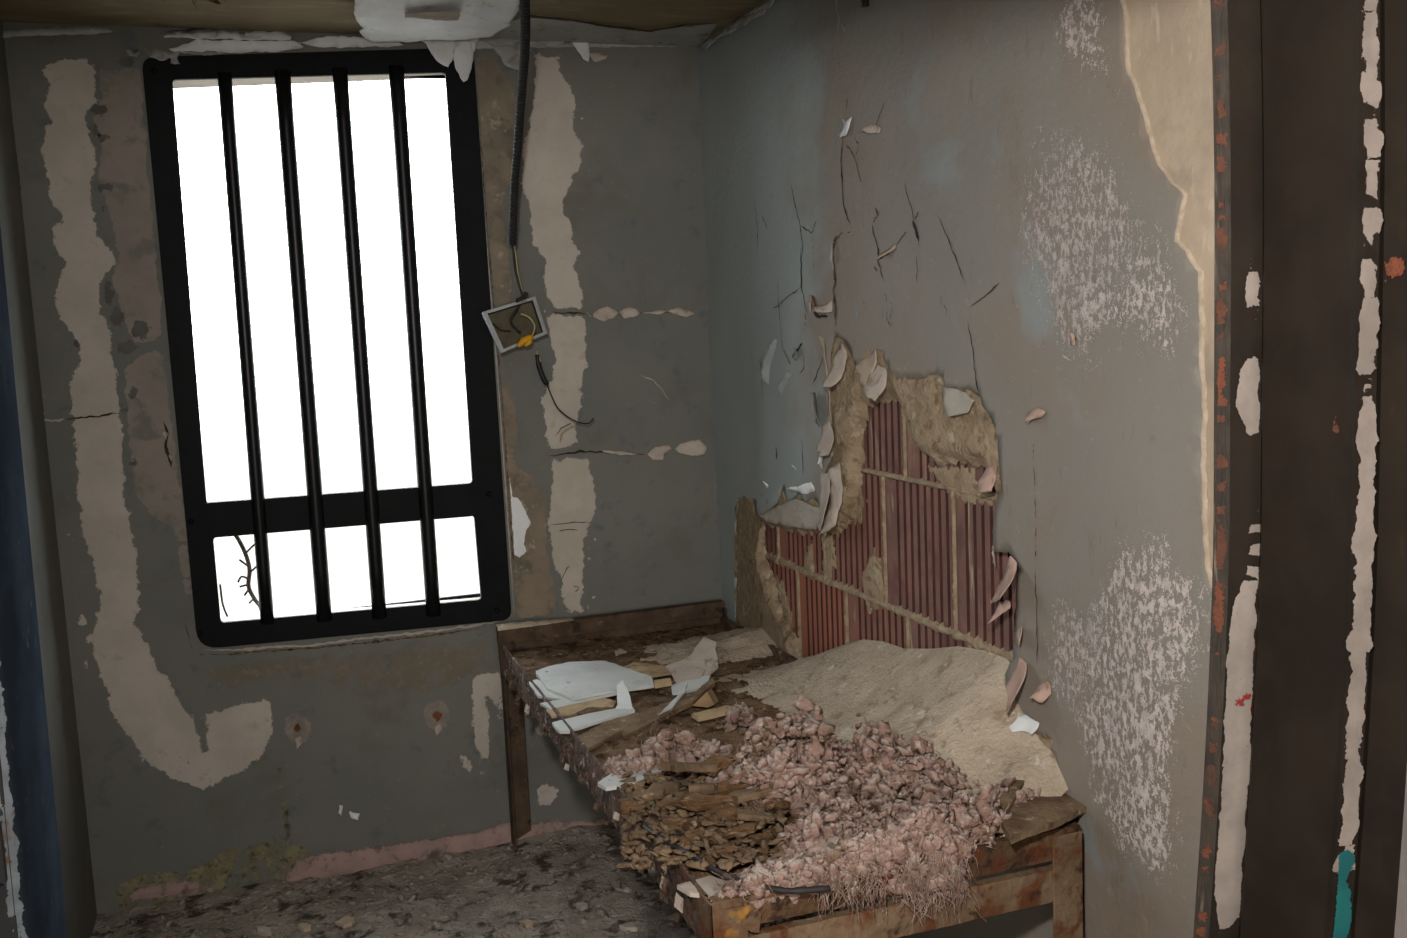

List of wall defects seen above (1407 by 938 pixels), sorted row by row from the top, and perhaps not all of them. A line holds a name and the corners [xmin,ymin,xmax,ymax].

peeling [41,0,775,792]
crack [755,182,823,383]
flaking render [734,334,1053,749]
crack [872,186,999,393]
efflorescence [1034,524,1212,892]
flaking render [1120,0,1215,589]
corrosion [1212,451,1228,657]
corrosion [1215,282,1229,340]
corrosion [1216,357,1228,423]
peeling [1214,510,1260,935]
peeling [1332,0,1384,938]
corrosion [1384,256,1405,282]